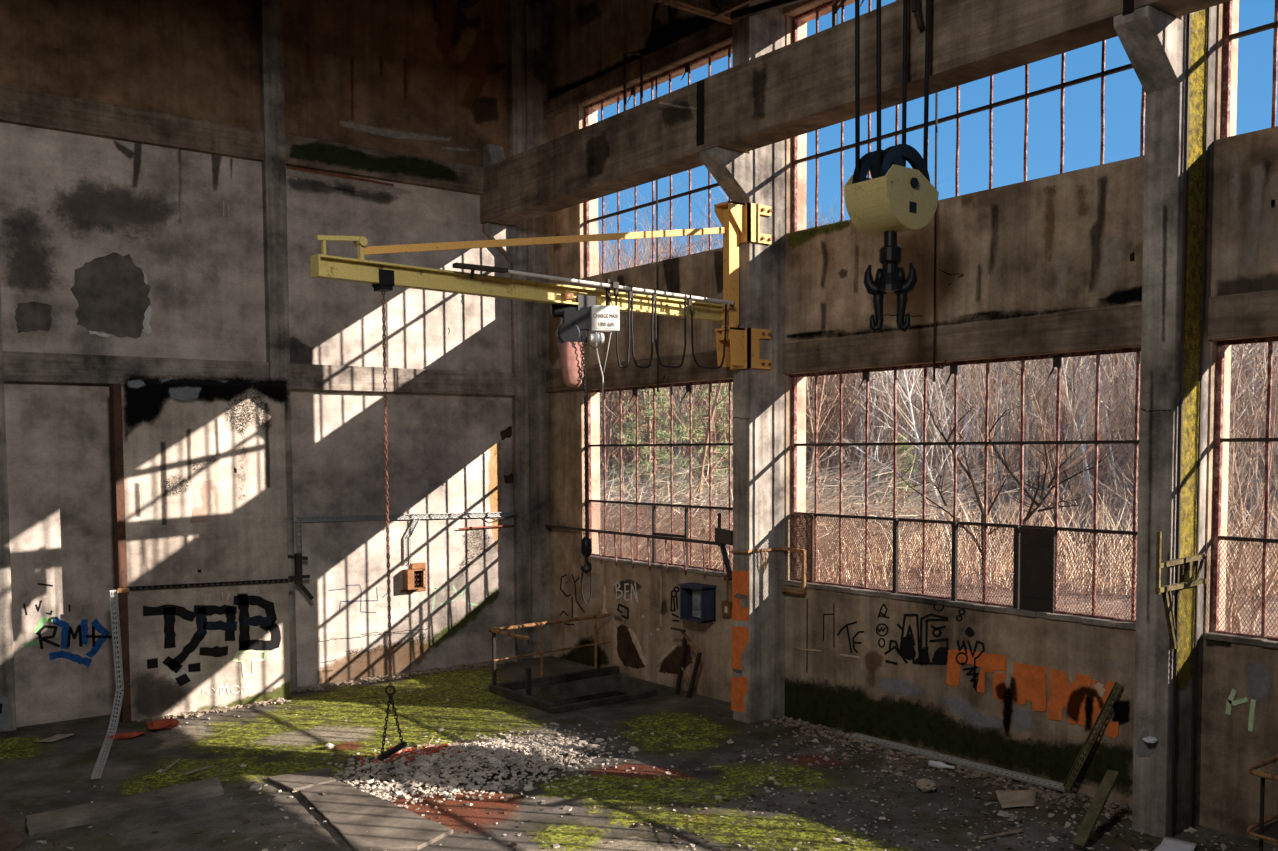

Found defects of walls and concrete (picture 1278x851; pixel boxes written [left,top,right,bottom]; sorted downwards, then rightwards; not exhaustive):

leakage [57,142,181,230]
leakage [212,155,232,188]
leakage [7,216,51,288]
spalling [71,252,152,338]
flaking render [162,379,200,400]